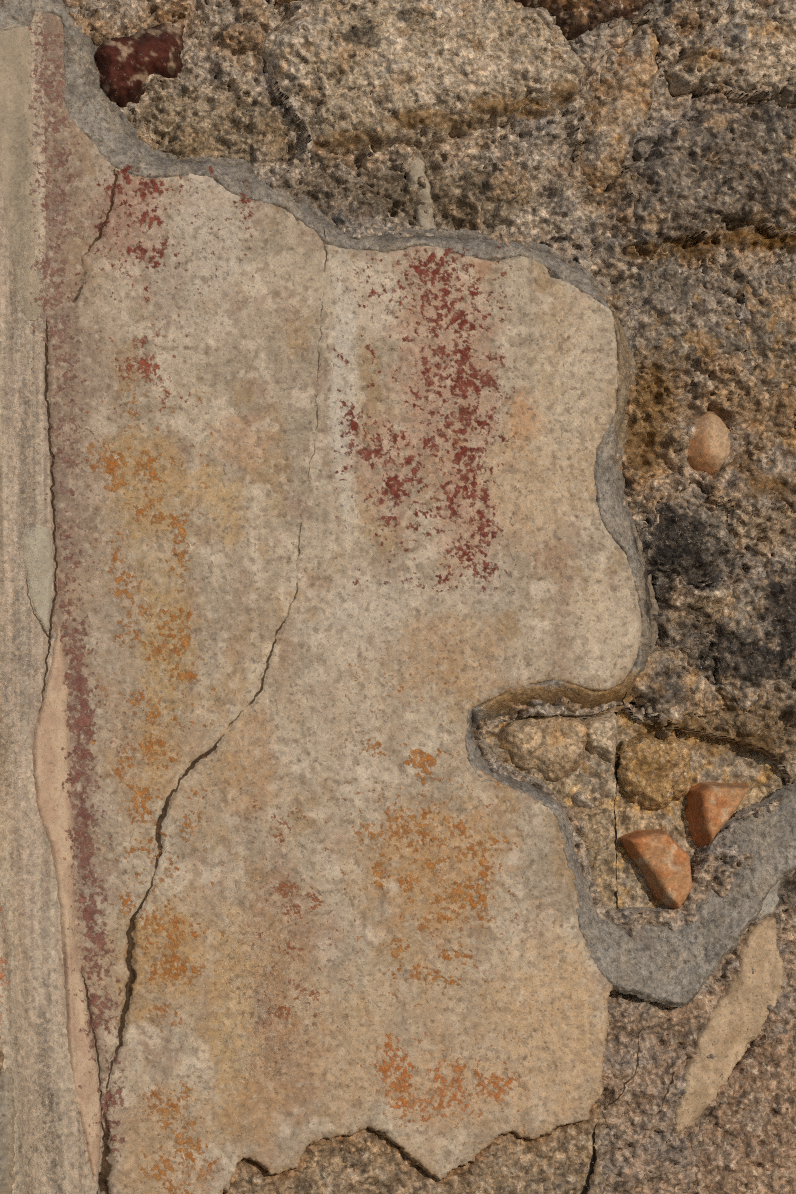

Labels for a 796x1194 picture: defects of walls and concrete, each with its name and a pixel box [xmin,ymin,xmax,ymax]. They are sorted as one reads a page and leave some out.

crack [27,319,58,710]
peeling [27,17,212,593]
peeling [334,246,516,592]
water stain [635,503,730,628]
water stain [698,568,796,684]
peeling [58,510,216,1163]
crack [81,588,298,1194]
peeling [266,879,334,925]
spalling [351,688,786,1005]
peeling [140,1082,219,1194]
spalling [220,1103,605,1194]
peeling [360,1033,520,1126]